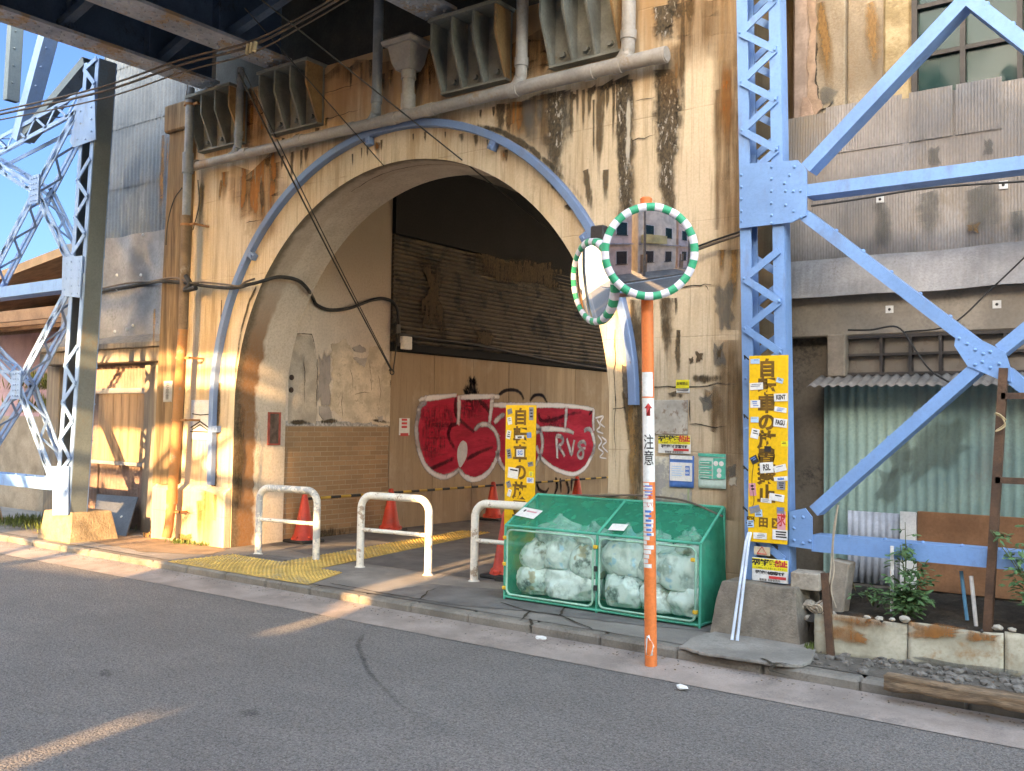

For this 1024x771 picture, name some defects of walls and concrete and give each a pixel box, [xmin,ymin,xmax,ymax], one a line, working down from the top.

corrosion [222,152,279,221]
damp [459,74,635,214]
damp [653,0,689,208]
flaking render [288,334,391,426]
corrosion [832,615,882,644]
corrosion [908,621,999,641]